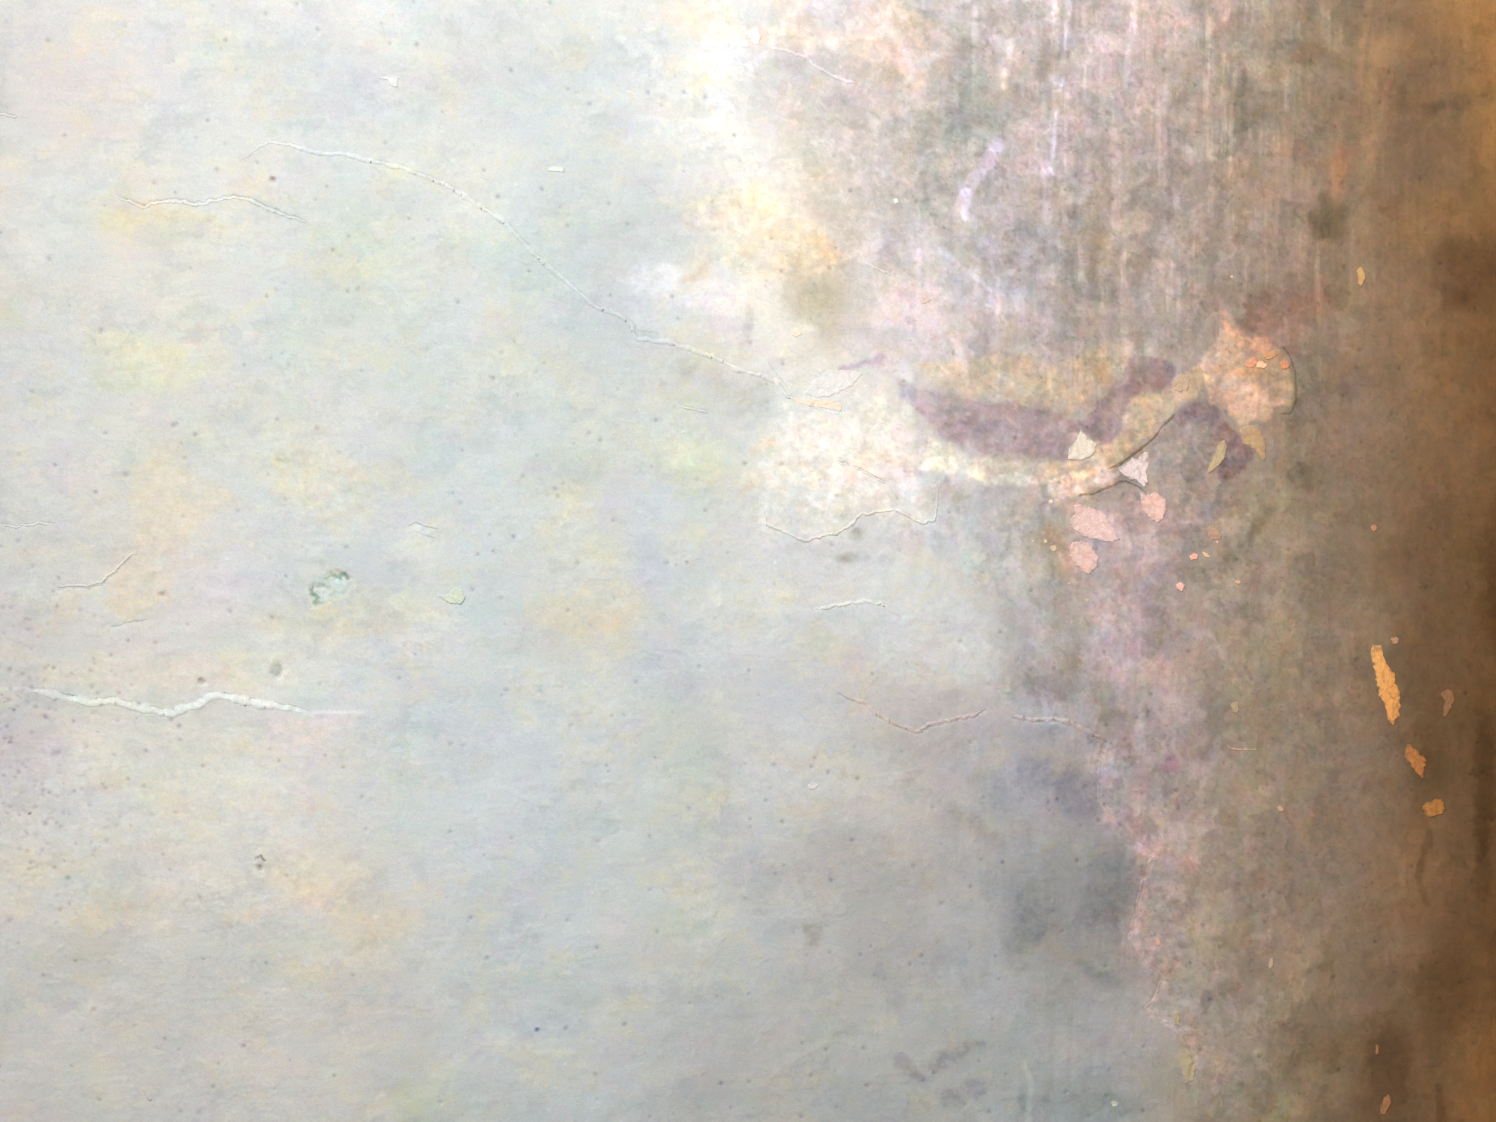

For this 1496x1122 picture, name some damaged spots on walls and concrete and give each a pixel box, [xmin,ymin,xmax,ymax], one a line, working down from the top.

water stain [645,0,1025,242]
crack [111,139,841,415]
water stain [609,177,857,428]
water stain [835,338,1179,460]
peeling [1068,430,1097,461]
peeling [1069,504,1119,574]
peeling [1119,452,1167,523]
peeling [1198,307,1301,489]
water stain [860,595,1026,698]
peeling [1370,637,1401,725]
water stain [940,493,1288,1122]
peeling [1405,744,1427,779]